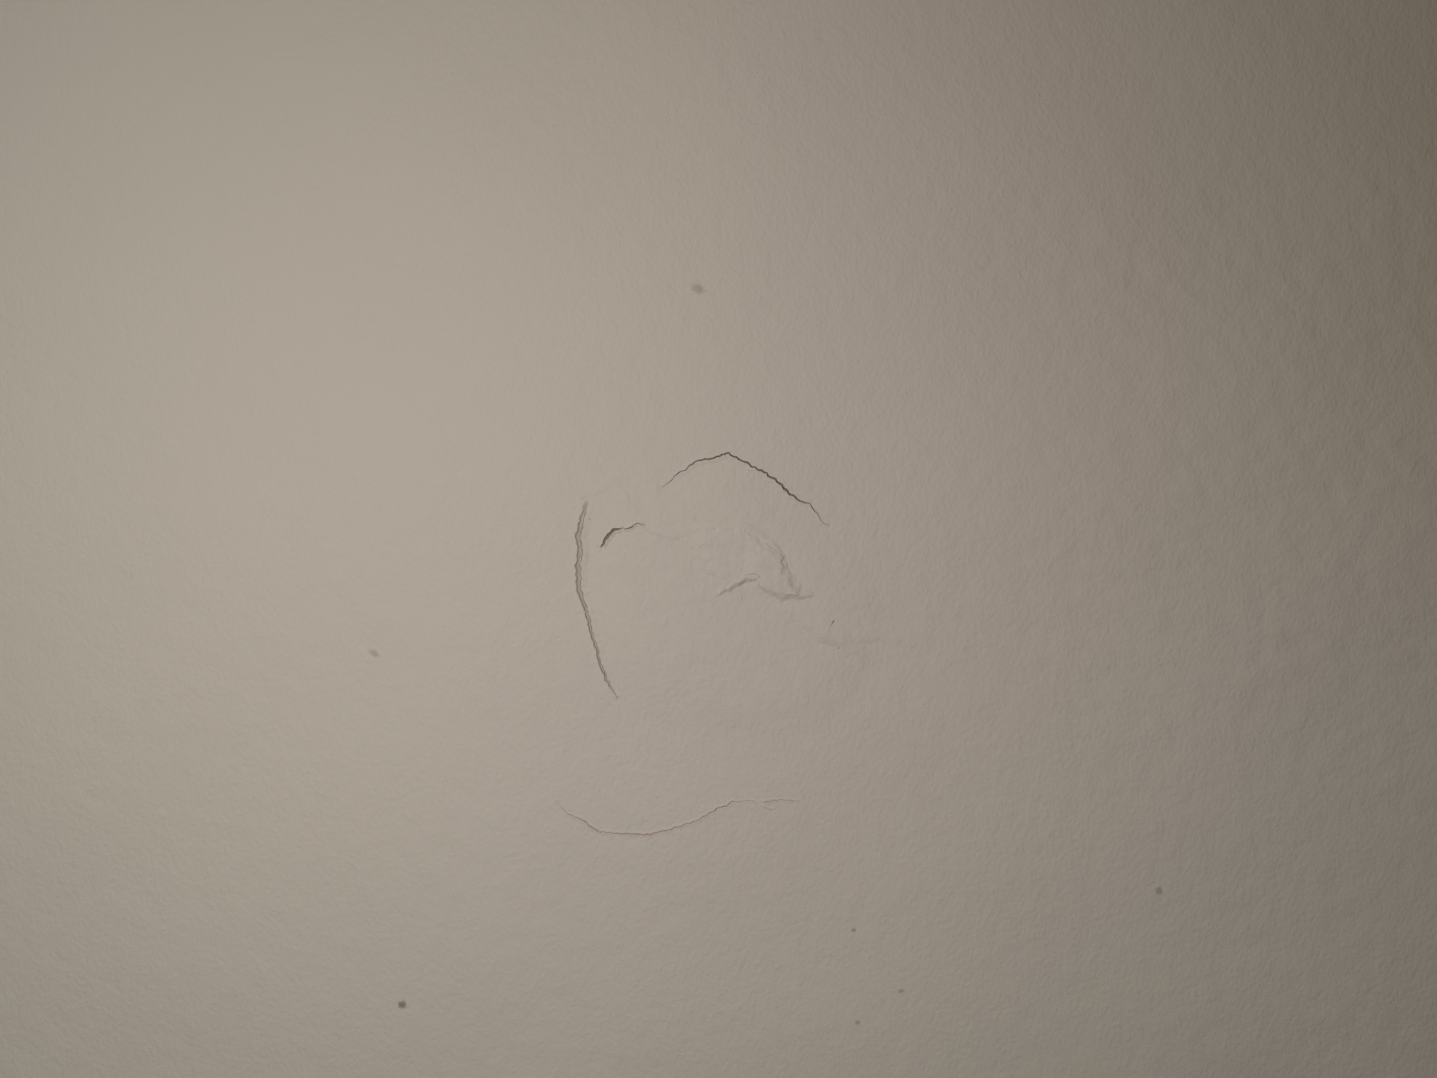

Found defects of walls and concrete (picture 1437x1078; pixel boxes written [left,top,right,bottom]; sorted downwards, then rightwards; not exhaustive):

crack [660,447,830,528]
crack [568,500,645,702]
crack [556,796,799,839]